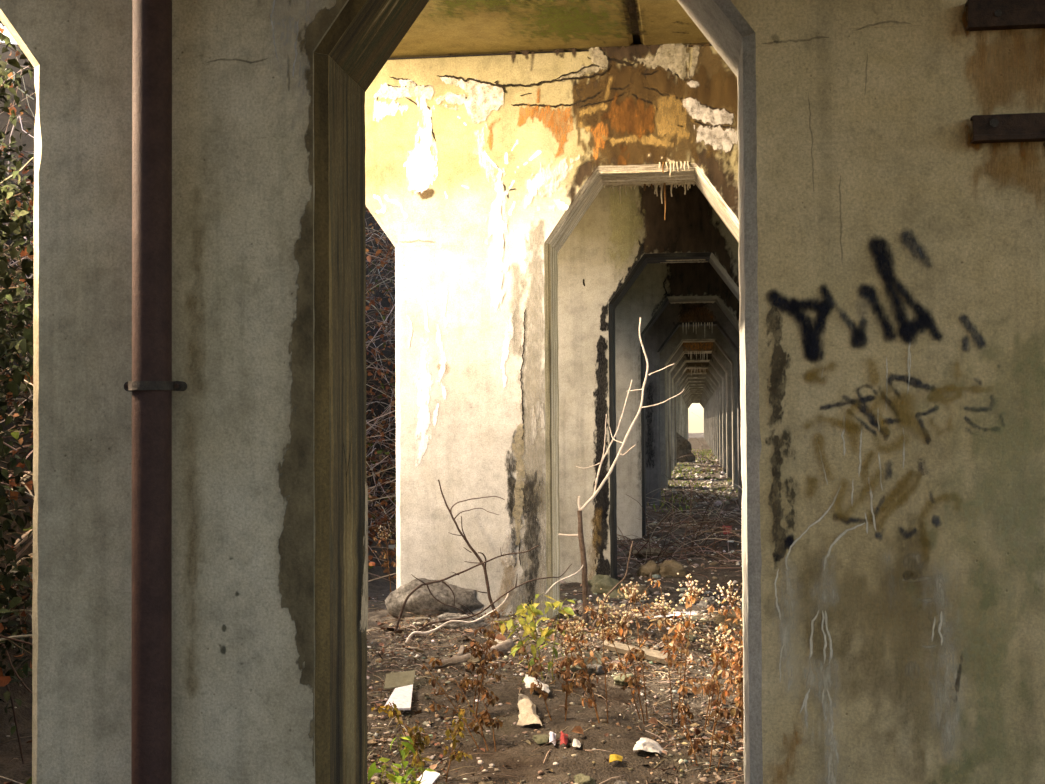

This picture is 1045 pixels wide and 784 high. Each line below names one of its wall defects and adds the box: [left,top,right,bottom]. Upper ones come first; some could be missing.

damp [403,96,448,199]
spalling [374,77,504,124]
crack [373,47,734,143]
spalling [560,47,608,82]
rust [517,78,693,165]
spalling [634,43,700,80]
damp [476,0,740,619]
damp [407,285,448,467]
damp [765,307,883,784]
damp [932,575,963,748]